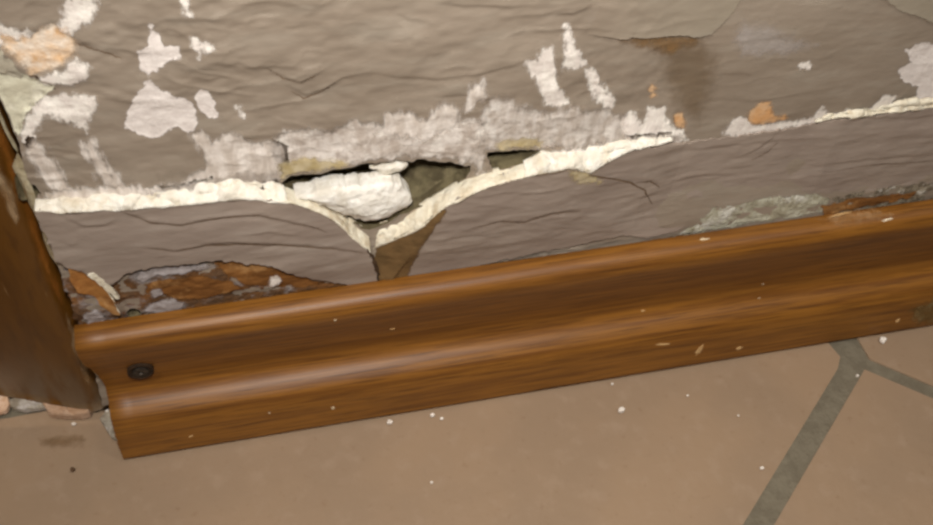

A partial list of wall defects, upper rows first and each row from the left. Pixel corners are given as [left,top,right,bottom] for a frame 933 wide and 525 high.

peeling [587,0,741,40]
peeling [887,0,933,23]
peeling [898,42,933,99]
spalling [0,0,689,201]
peeling [722,102,851,137]
peeling [869,95,896,110]
spalling [61,260,346,324]